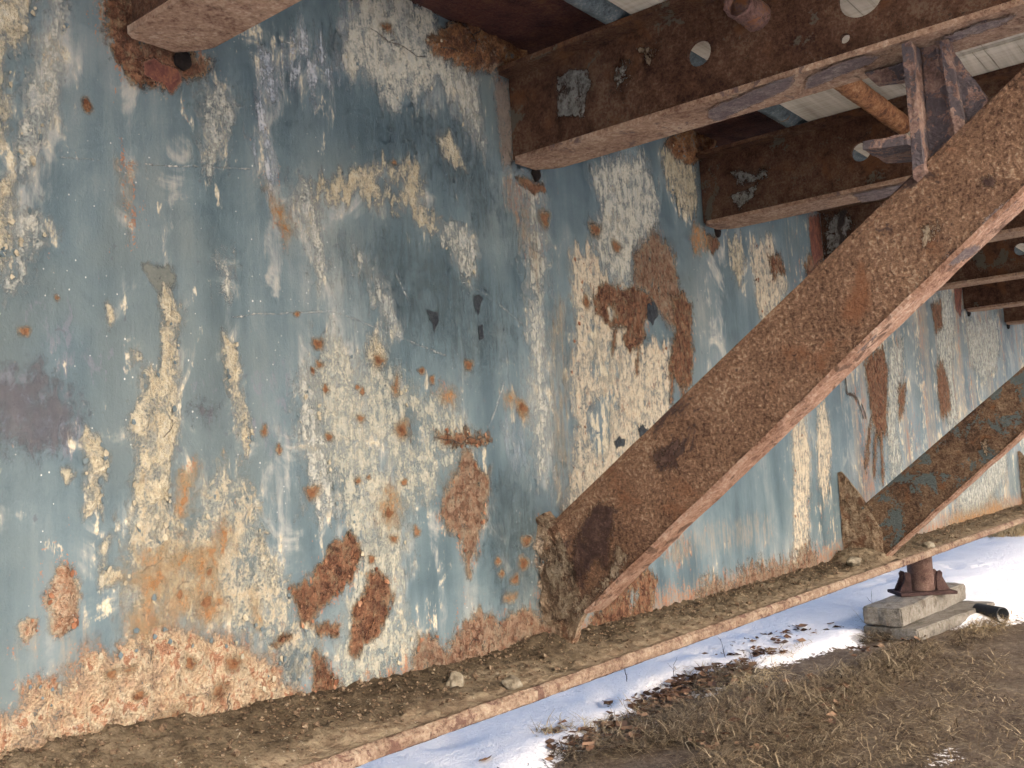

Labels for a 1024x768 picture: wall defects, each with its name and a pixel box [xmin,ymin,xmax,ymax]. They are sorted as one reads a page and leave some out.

peeling [0,0,71,294]
corrosion [101,0,214,94]
peeling [197,0,487,199]
peeling [290,150,478,293]
peeling [60,425,115,520]
peeling [98,282,321,692]
peeling [289,251,476,689]
corrosion [436,426,493,580]
corrosion [583,226,696,403]
corrosion [862,344,906,486]
corrosion [936,358,951,419]
corrosion [0,518,395,759]